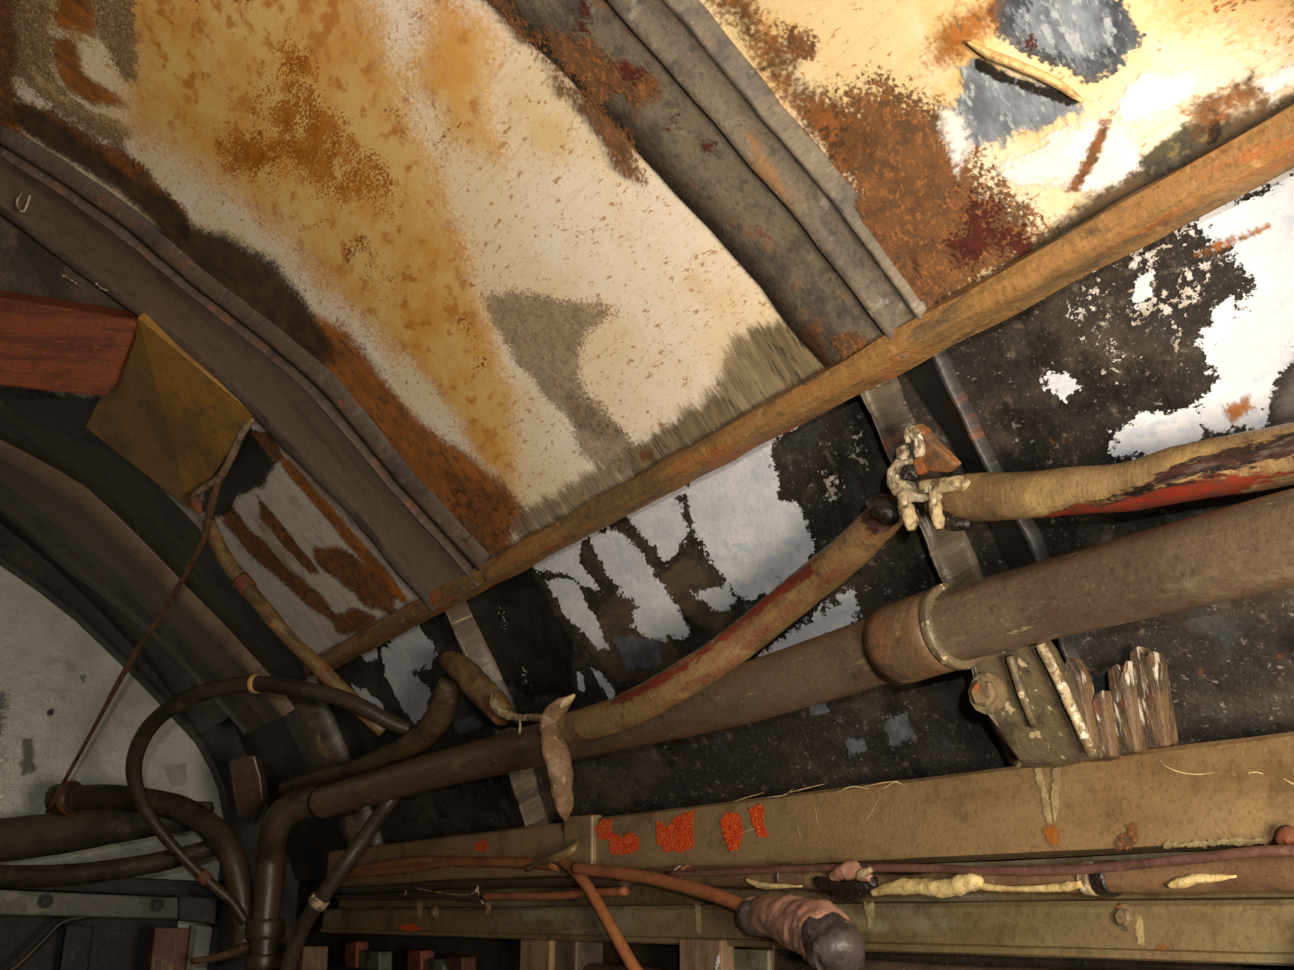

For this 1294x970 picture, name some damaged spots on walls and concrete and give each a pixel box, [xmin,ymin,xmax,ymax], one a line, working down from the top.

peeling [10,0,142,156]
rust [0,0,187,216]
rust [708,0,1059,308]
peeling [937,0,1198,192]
rust [39,0,685,556]
damp [482,287,742,477]
peeling [1039,362,1081,403]
peeling [1066,168,1294,460]
rust [223,456,410,635]
peeling [577,667,615,699]
peeling [533,427,816,672]
peeling [758,588,862,657]